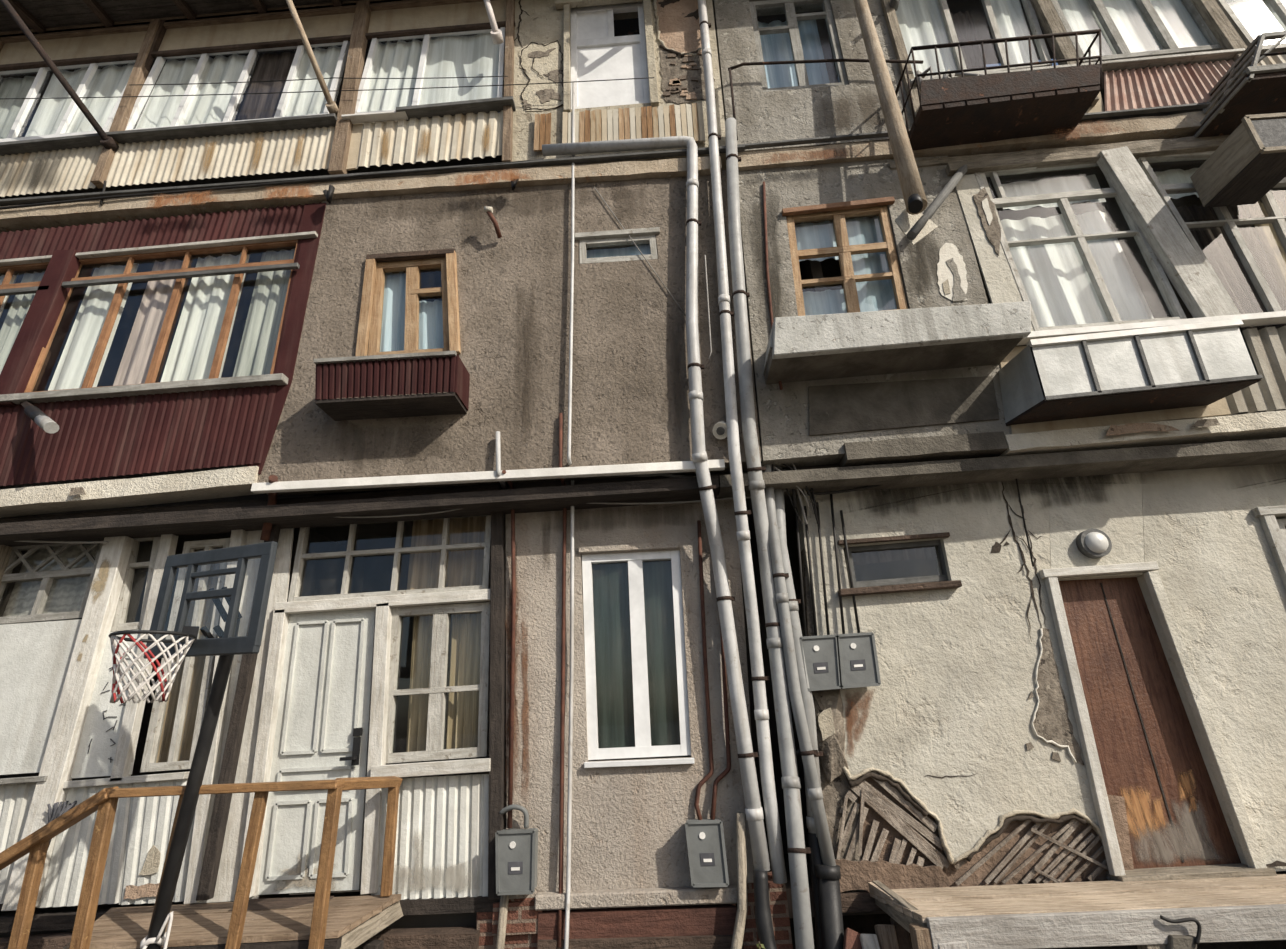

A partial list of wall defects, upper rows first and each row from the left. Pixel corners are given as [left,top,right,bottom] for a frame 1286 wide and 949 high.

flaking render [519,40,563,112]
flaking render [653,0,716,104]
peeling [937,243,968,302]
crack [992,482,1046,642]
flaking render [1026,628,1084,765]
flaking render [834,766,1111,893]